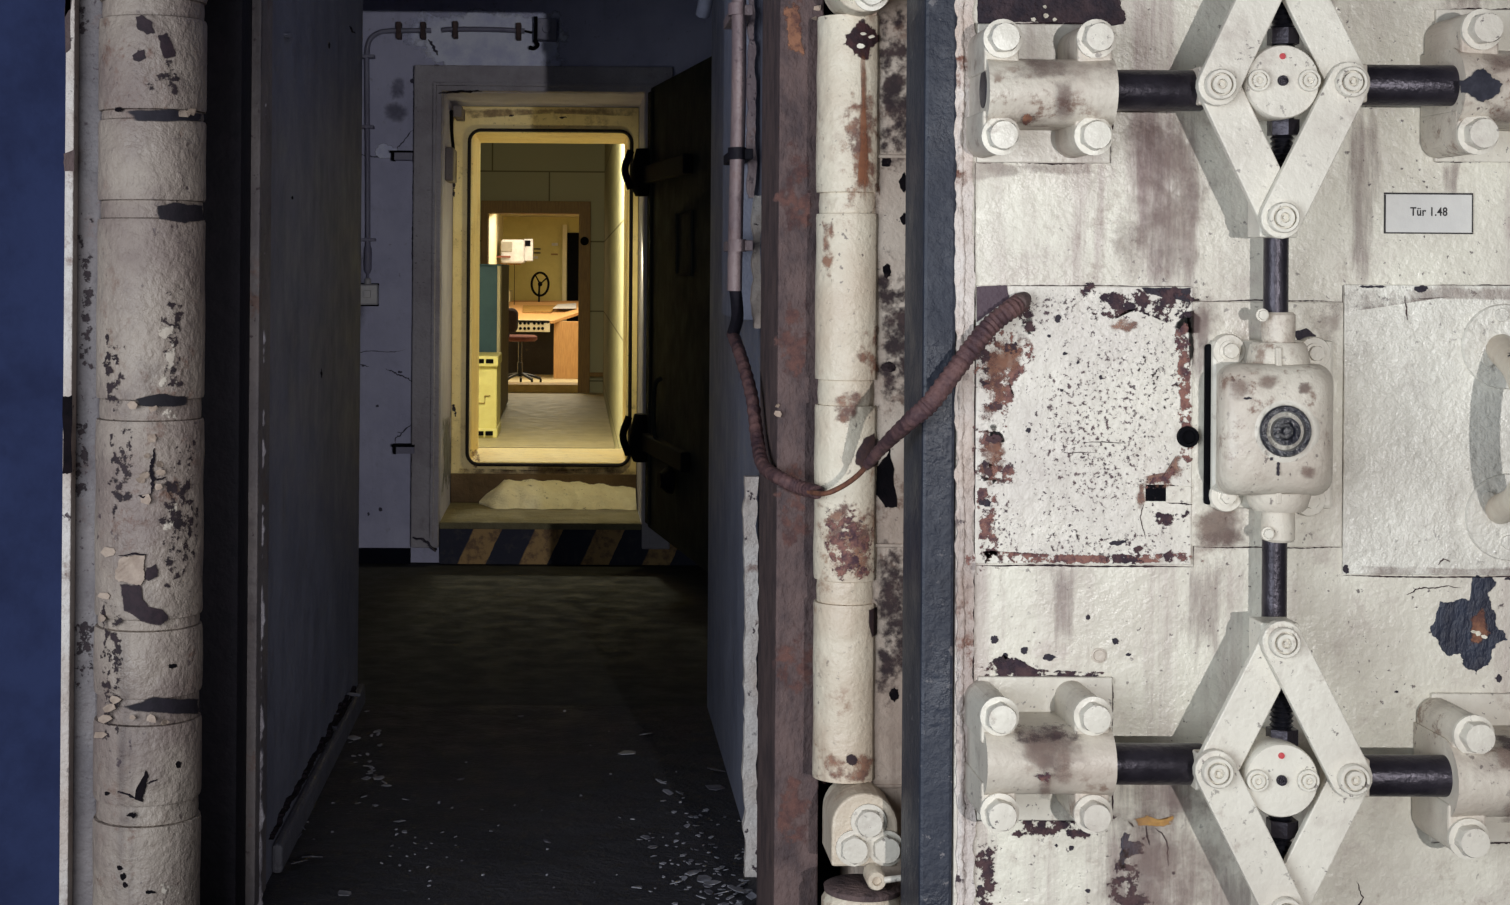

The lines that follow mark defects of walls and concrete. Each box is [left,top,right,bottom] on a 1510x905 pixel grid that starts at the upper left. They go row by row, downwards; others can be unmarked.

peeling [132,15,196,117]
peeling [408,9,568,66]
rust [977,0,1126,26]
rust [845,60,880,194]
rust [972,324,1035,486]
peeling [158,440,202,588]
rust [817,504,875,581]
rust [1137,456,1181,505]
peeling [74,547,156,758]
peeling [1430,575,1510,683]